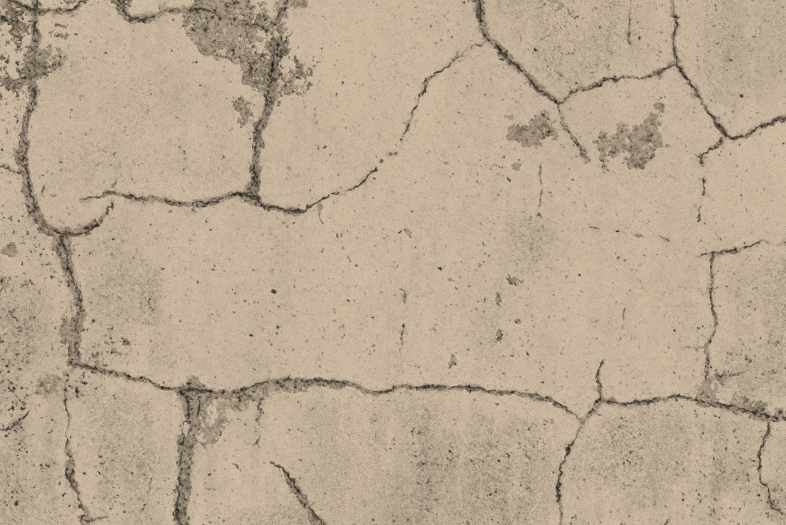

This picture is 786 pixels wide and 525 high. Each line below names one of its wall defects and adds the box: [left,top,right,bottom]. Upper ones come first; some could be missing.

peeling [0,5,30,111]
peeling [35,23,69,80]
crack [0,0,185,393]
crack [78,0,383,224]
peeling [231,96,253,128]
peeling [180,0,318,107]
peeling [503,110,558,149]
crack [400,0,786,222]
peeling [592,102,670,174]
crack [683,240,786,384]
crack [63,385,109,525]
crack [172,360,786,525]